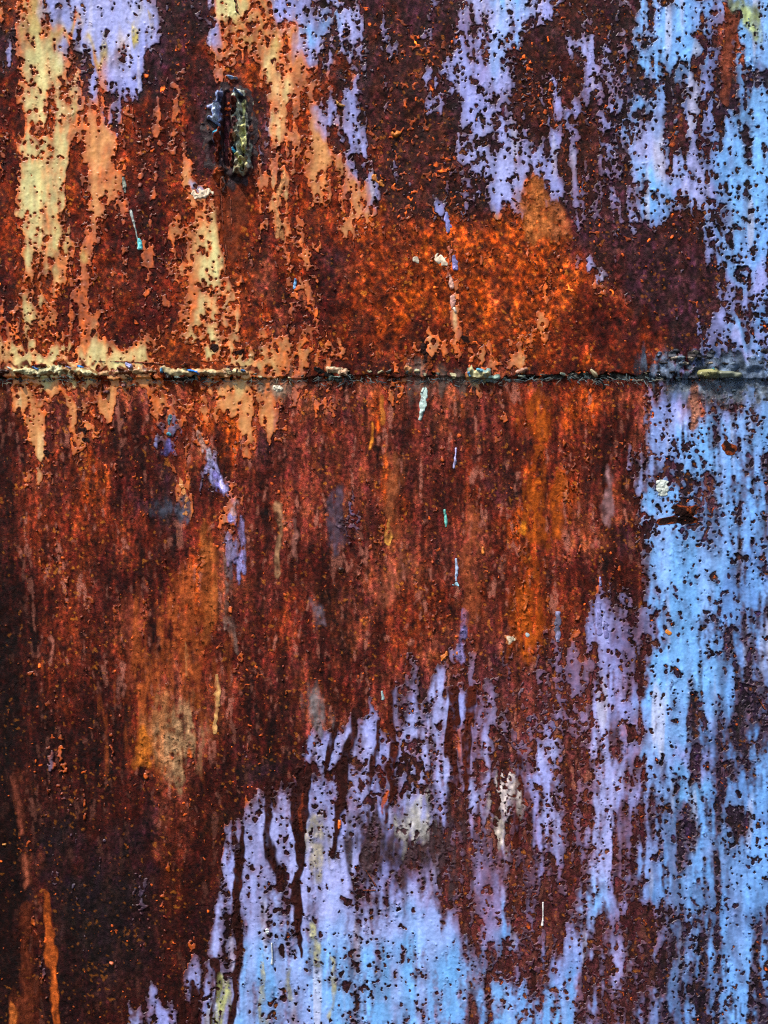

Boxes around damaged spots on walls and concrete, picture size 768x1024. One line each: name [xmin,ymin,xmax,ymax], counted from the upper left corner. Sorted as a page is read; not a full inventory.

rust [56,182,201,414]
peeling [0,0,408,572]
rust [195,169,293,354]
rust [525,389,550,463]
peeling [183,0,768,1024]
peeling [45,669,87,821]
peeling [138,706,196,786]
rust [263,749,312,958]
rust [311,702,366,859]
rust [367,720,380,786]
rust [739,941,768,995]